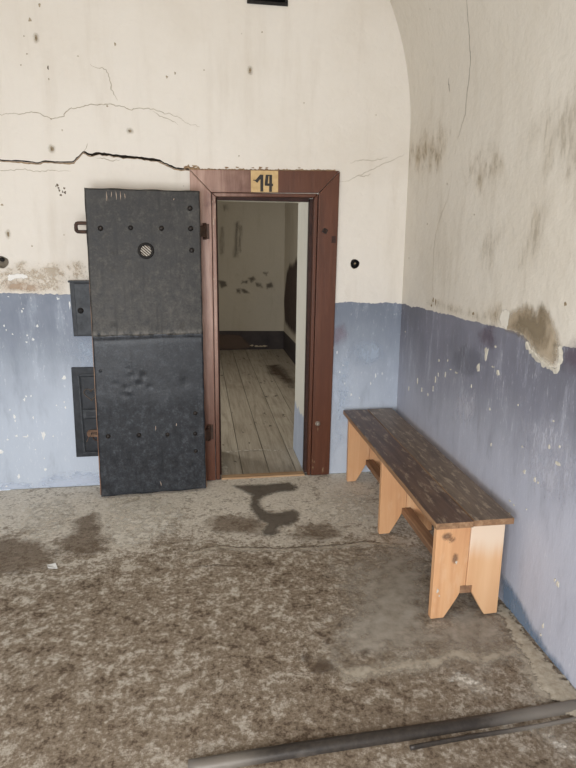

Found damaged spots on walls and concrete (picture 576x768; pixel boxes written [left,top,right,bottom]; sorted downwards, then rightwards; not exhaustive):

crack [3,64,198,127]
crack [0,146,190,172]
flaking render [0,253,63,297]
flaking render [500,309,510,329]
flaking render [525,341,563,374]
leakage [213,483,299,535]
leakage [62,515,101,555]
leakage [0,539,51,572]